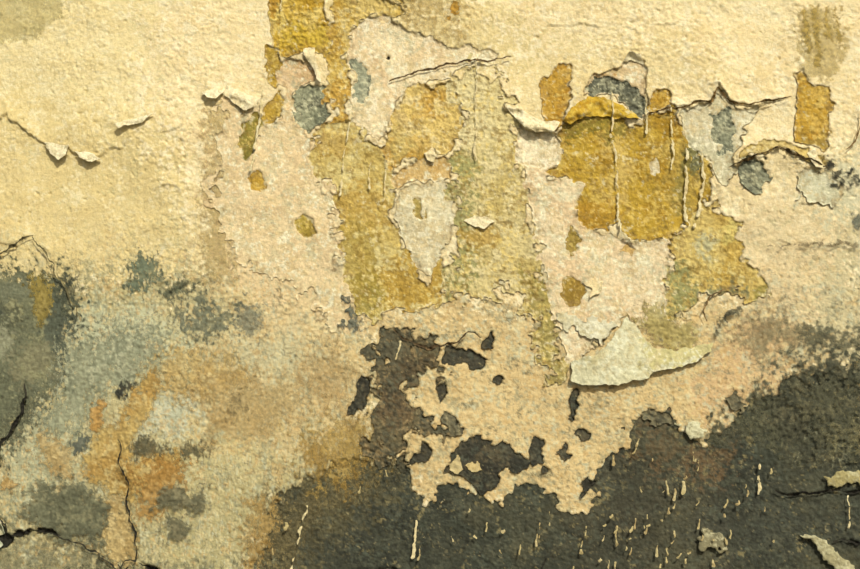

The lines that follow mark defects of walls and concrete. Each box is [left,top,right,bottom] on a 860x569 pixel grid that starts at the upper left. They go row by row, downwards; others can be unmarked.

crack [730,146,826,169]
crack [0,383,27,461]
damp [0,247,267,475]
damp [337,295,369,333]
peeling [200,0,860,569]
damp [684,296,860,472]
damp [0,465,120,569]
crack [0,440,156,569]
damp [149,483,212,545]
damp [200,454,400,569]